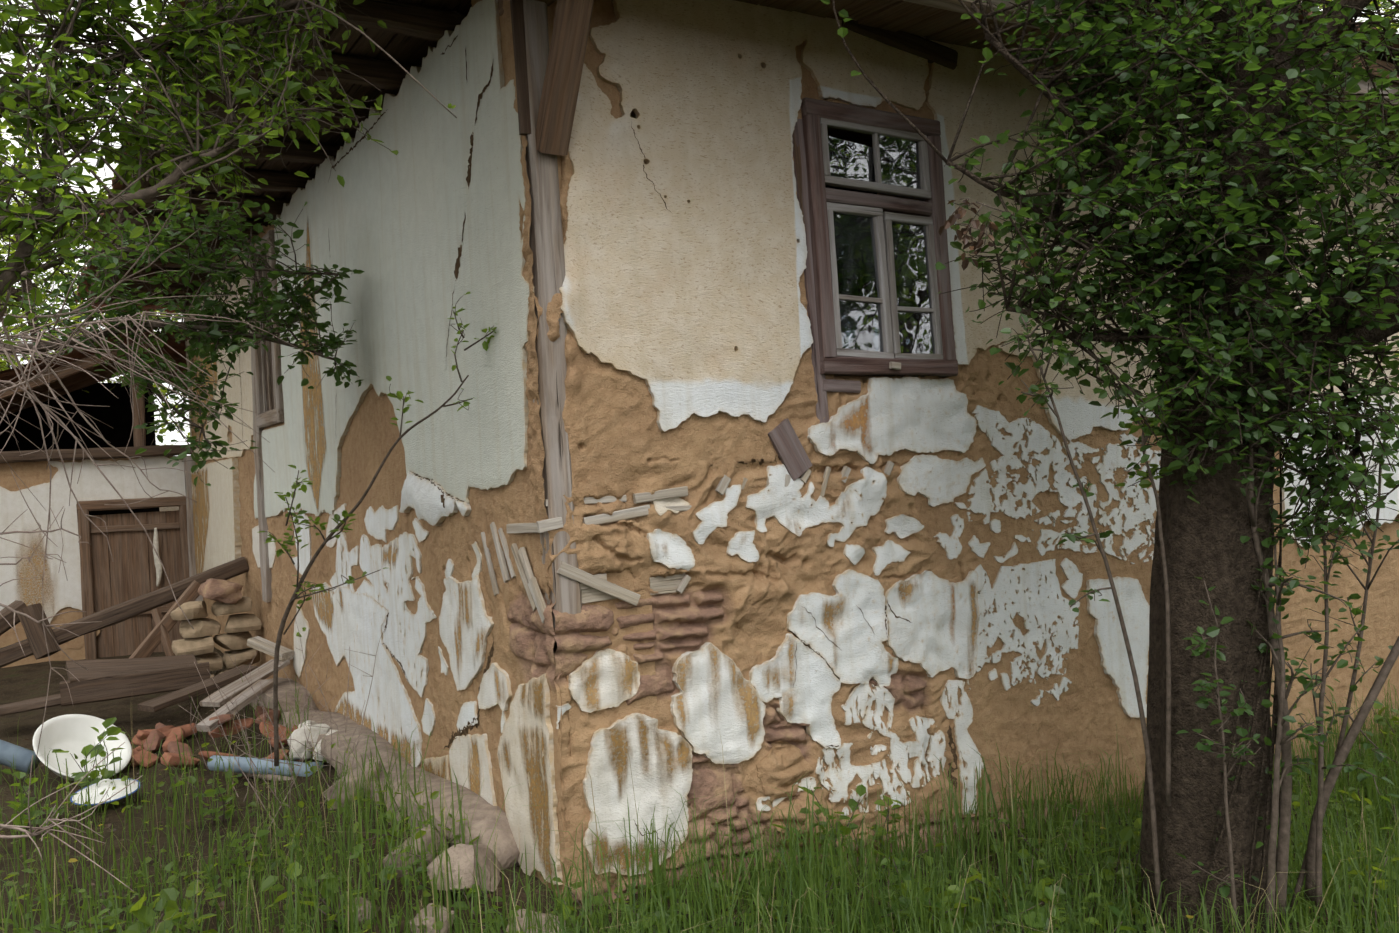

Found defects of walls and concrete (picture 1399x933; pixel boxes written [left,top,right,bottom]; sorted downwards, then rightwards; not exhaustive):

crack [442,36,493,357]
flaking render [499,0,518,113]
flaking render [584,0,622,119]
crack [631,125,667,209]
flaking render [196,135,1162,909]
flaking render [1270,450,1399,768]